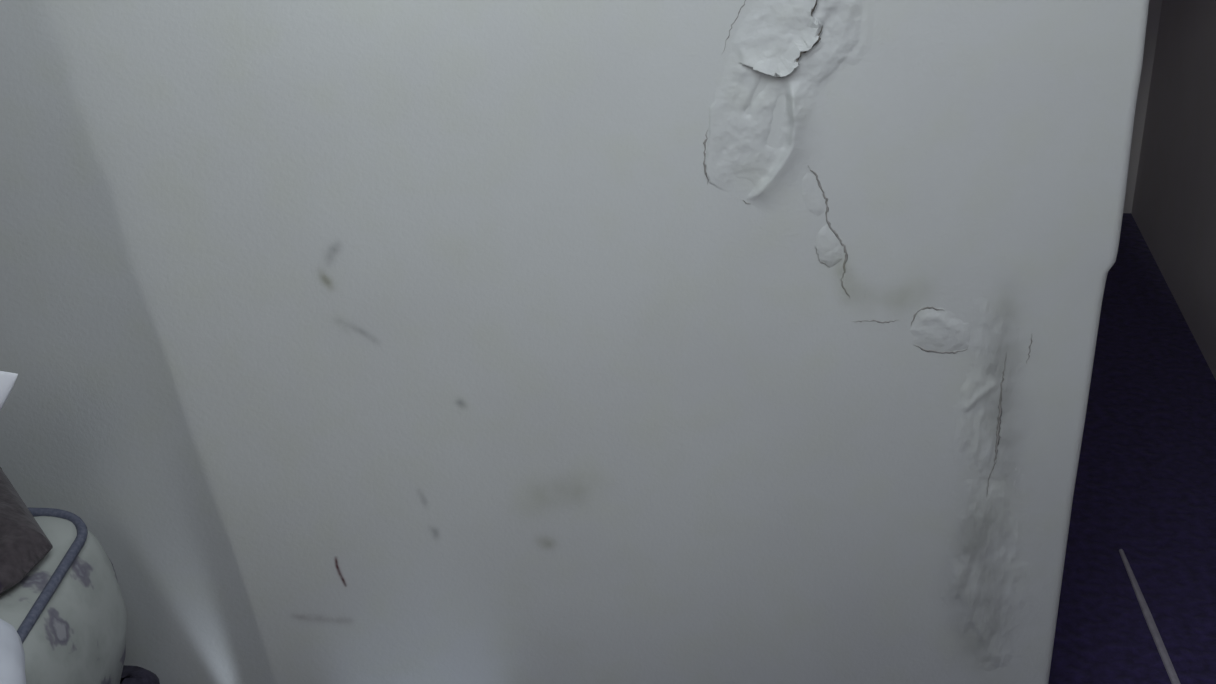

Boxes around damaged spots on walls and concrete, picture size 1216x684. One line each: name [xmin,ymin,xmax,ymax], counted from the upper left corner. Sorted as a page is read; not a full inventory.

peeling [703,0,875,214]
crack [802,166,896,323]